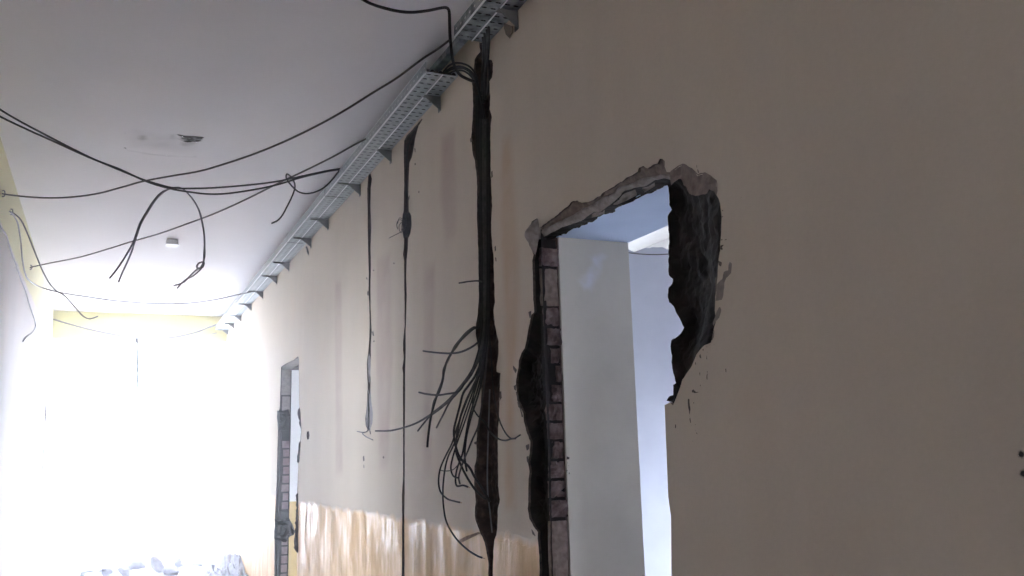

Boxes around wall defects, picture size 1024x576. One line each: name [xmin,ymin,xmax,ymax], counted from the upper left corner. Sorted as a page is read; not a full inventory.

flaking render [274,358,310,576]
flaking render [513,159,732,576]